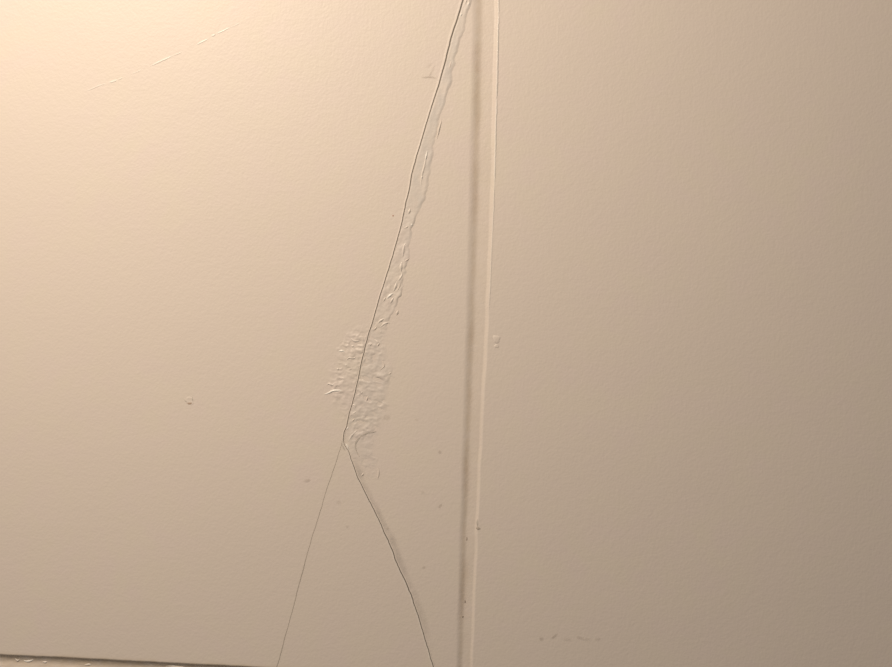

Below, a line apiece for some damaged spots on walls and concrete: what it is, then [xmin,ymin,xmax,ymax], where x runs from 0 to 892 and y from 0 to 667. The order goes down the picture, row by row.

crack [276,0,464,667]